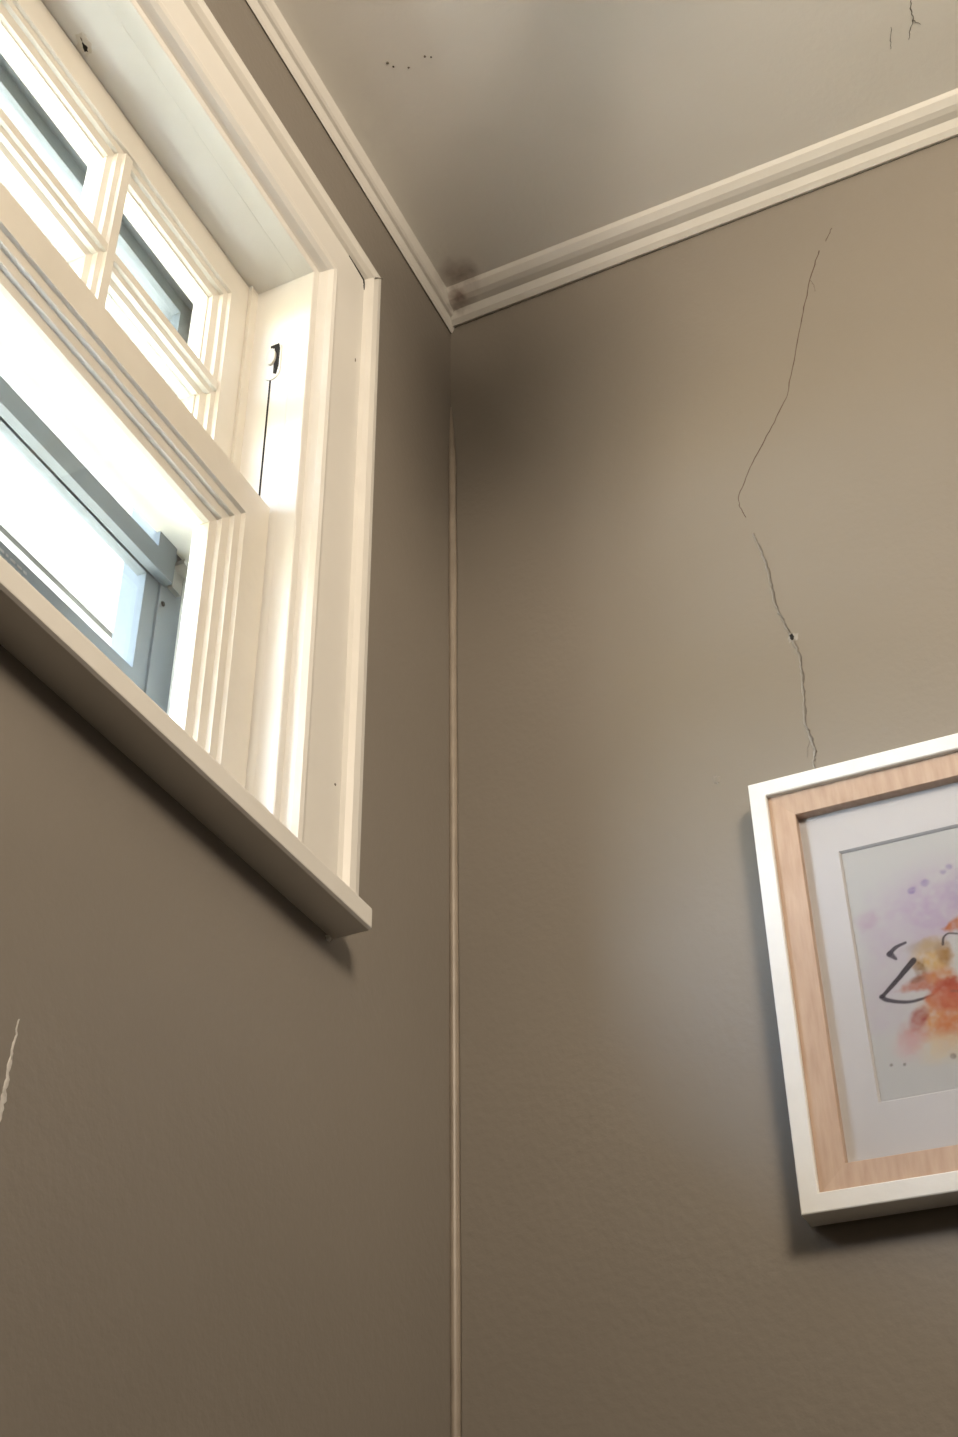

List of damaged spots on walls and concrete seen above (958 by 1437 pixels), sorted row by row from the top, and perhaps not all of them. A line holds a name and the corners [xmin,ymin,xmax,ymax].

crack [738,228,832,769]